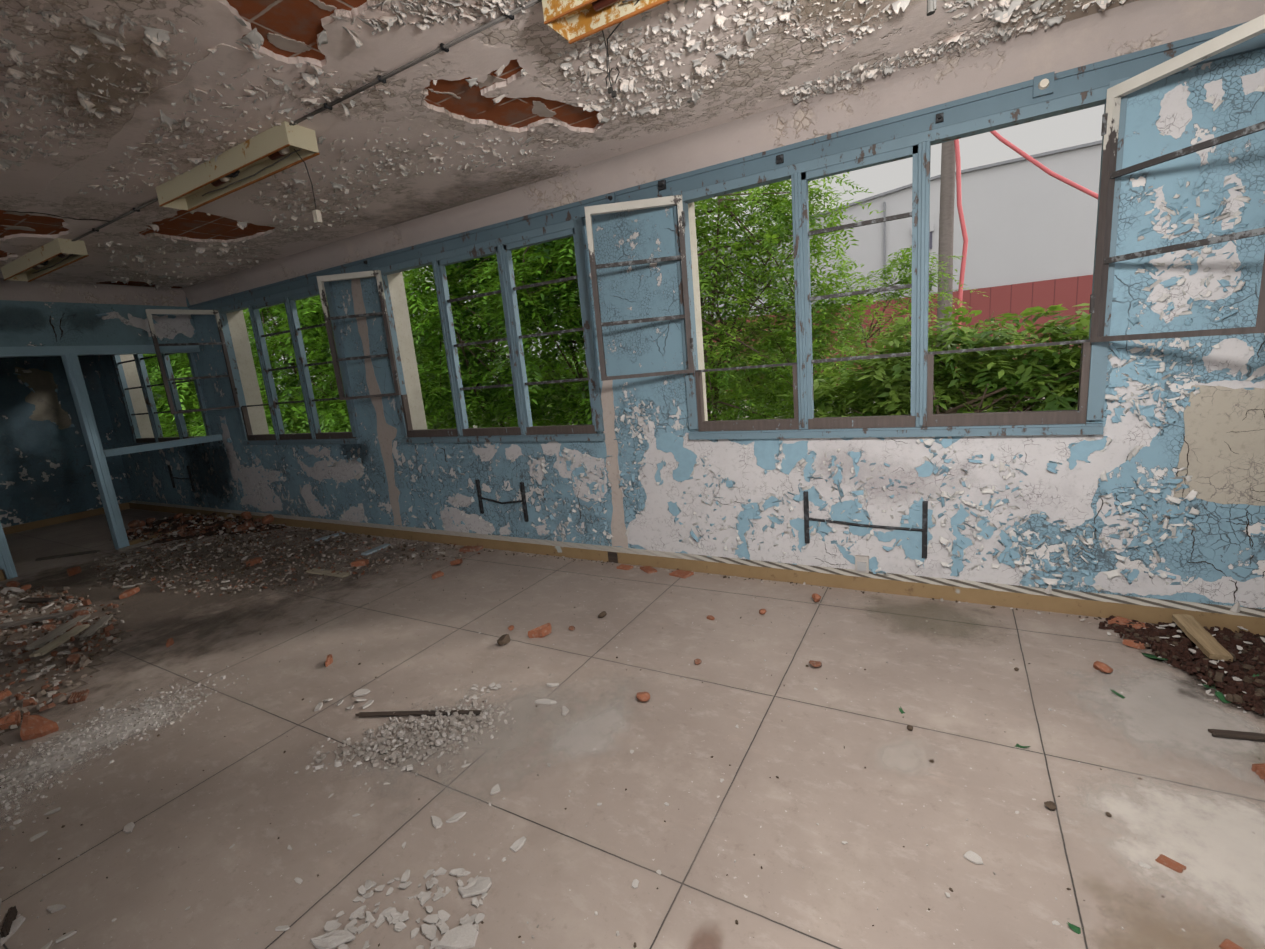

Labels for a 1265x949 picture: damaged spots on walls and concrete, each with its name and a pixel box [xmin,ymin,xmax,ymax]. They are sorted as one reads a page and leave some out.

peeling [0,0,527,195]
spalling [93,0,910,290]
peeling [780,0,1126,105]
peeling [1152,62,1225,139]
peeling [1240,68,1265,95]
spalling [0,210,69,262]
peeling [397,134,1265,613]
peeling [219,416,386,523]
crack [1094,493,1151,549]
crack [1158,434,1265,603]
crack [1224,409,1265,454]